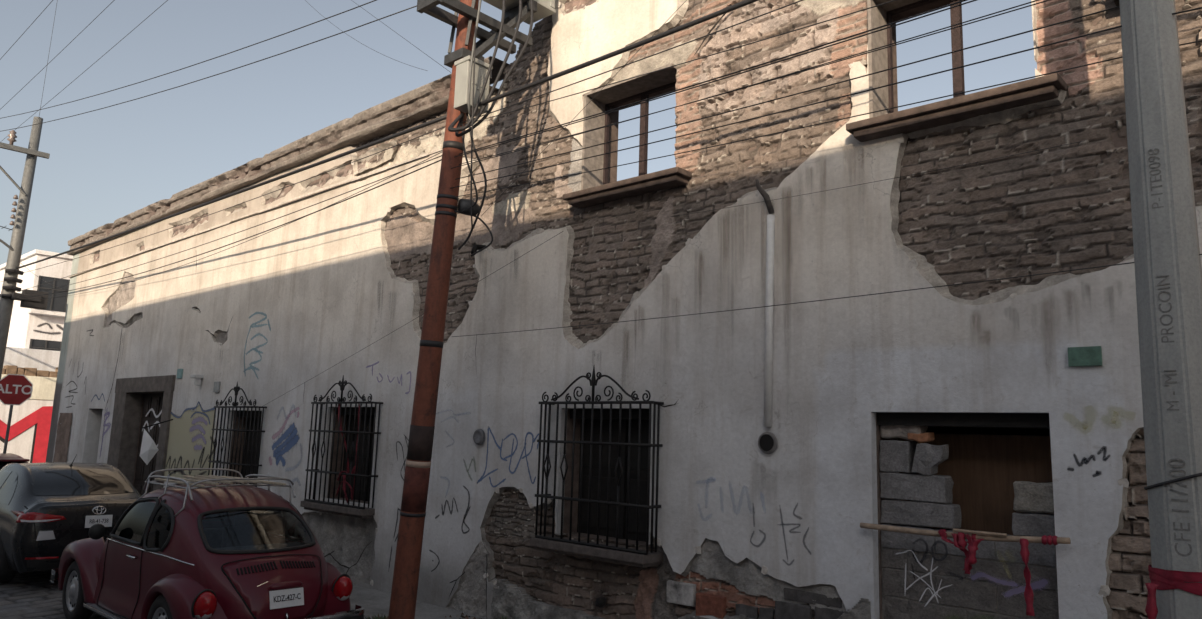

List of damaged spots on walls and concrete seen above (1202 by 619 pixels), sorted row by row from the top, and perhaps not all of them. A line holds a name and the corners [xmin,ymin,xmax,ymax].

spalling [101,270,143,328]
spalling [225,111,447,216]
spalling [381,202,435,339]
spalling [443,0,868,349]
spalling [890,0,1134,306]
spalling [1175,0,1202,207]
spalling [446,487,847,619]
spalling [1098,427,1152,619]